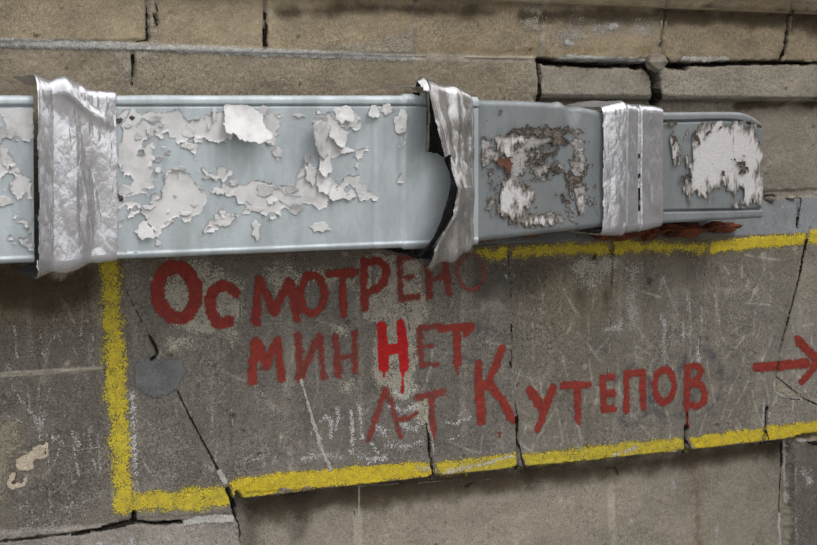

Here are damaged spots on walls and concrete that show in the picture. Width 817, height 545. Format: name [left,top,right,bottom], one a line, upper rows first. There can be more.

peeling [212,104,273,144]
peeling [305,105,357,201]
peeling [134,221,161,246]
peeling [309,221,332,233]
crack [127,293,159,360]
crack [776,190,817,405]
crack [405,303,436,476]
crack [177,390,241,543]
crack [0,511,183,542]